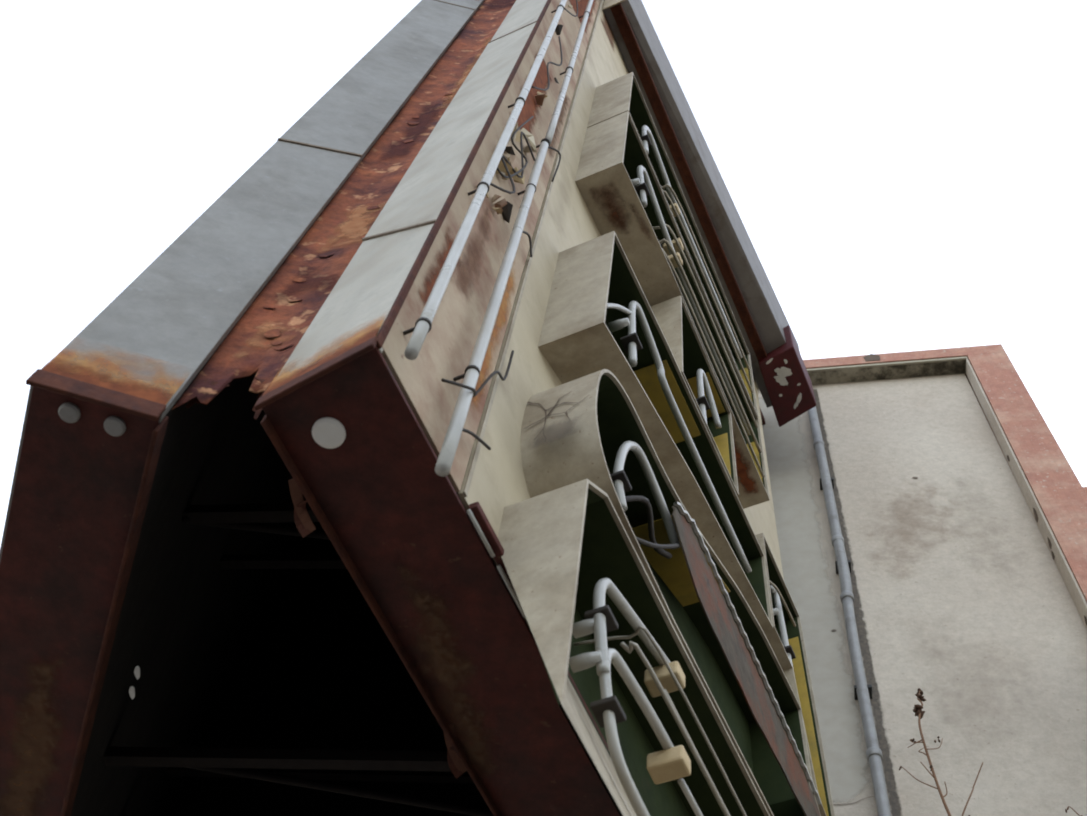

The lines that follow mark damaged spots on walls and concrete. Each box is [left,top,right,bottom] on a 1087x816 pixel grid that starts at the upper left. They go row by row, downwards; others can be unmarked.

corrosion [487,0,514,9]
corrosion [381,38,491,158]
corrosion [318,203,386,257]
corrosion [420,216,489,305]
corrosion [284,275,340,302]
corrosion [41,350,185,405]
corrosion [262,318,384,396]
crack [524,391,589,440]